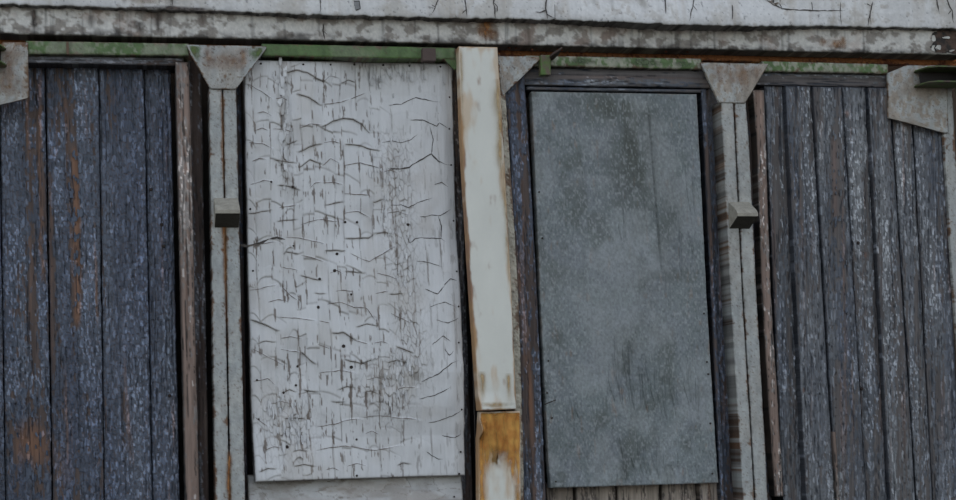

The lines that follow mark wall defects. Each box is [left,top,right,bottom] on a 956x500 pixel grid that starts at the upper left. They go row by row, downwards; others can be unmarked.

crack [240,70,459,472]
corrosion [480,403,520,500]